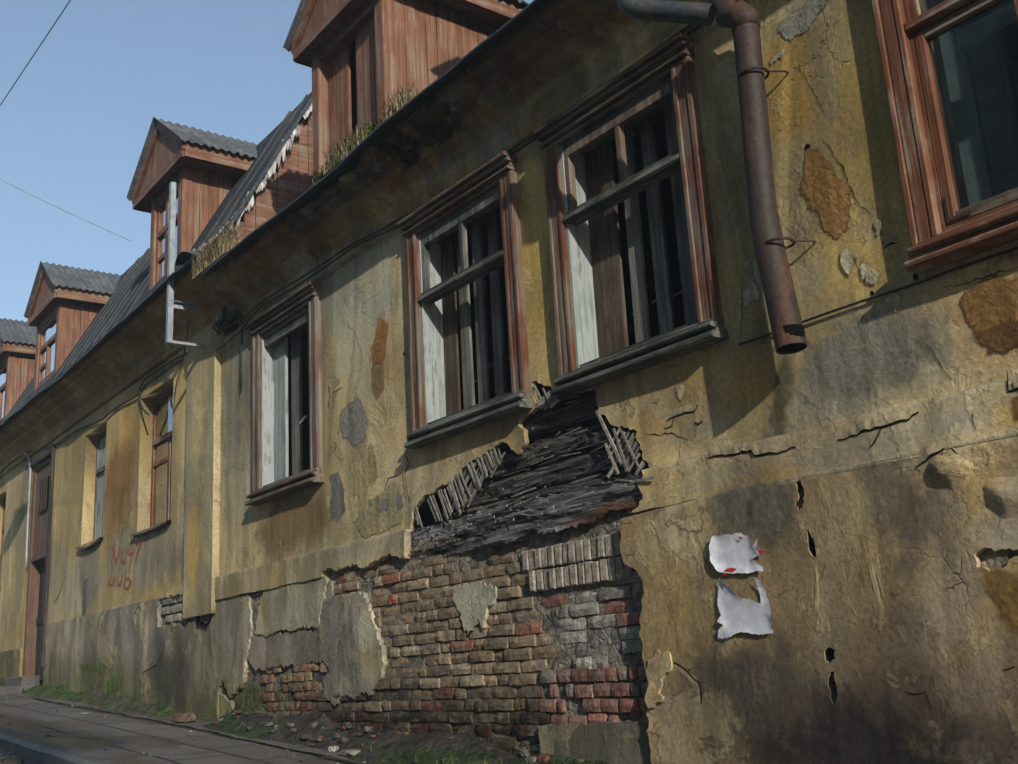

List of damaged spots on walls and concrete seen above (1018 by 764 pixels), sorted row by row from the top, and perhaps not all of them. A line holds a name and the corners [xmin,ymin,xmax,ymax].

crack [823,139,874,216]
peeling [799,147,879,284]
crack [863,233,898,248]
peeling [960,272,1018,355]
crack [1004,363,1018,392]
peeling [329,377,403,538]
crack [837,402,919,448]
crack [913,438,957,468]
damp [711,479,794,543]
spalling [977,548,1018,570]
flaking render [261,532,648,755]
damp [755,692,966,764]